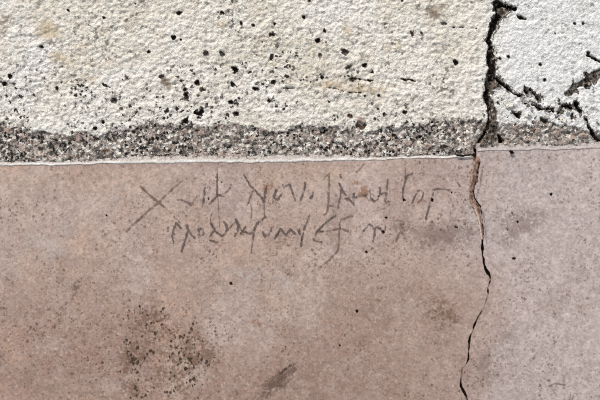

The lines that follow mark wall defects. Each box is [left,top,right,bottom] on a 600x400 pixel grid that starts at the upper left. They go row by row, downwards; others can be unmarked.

crack [453,0,600,400]